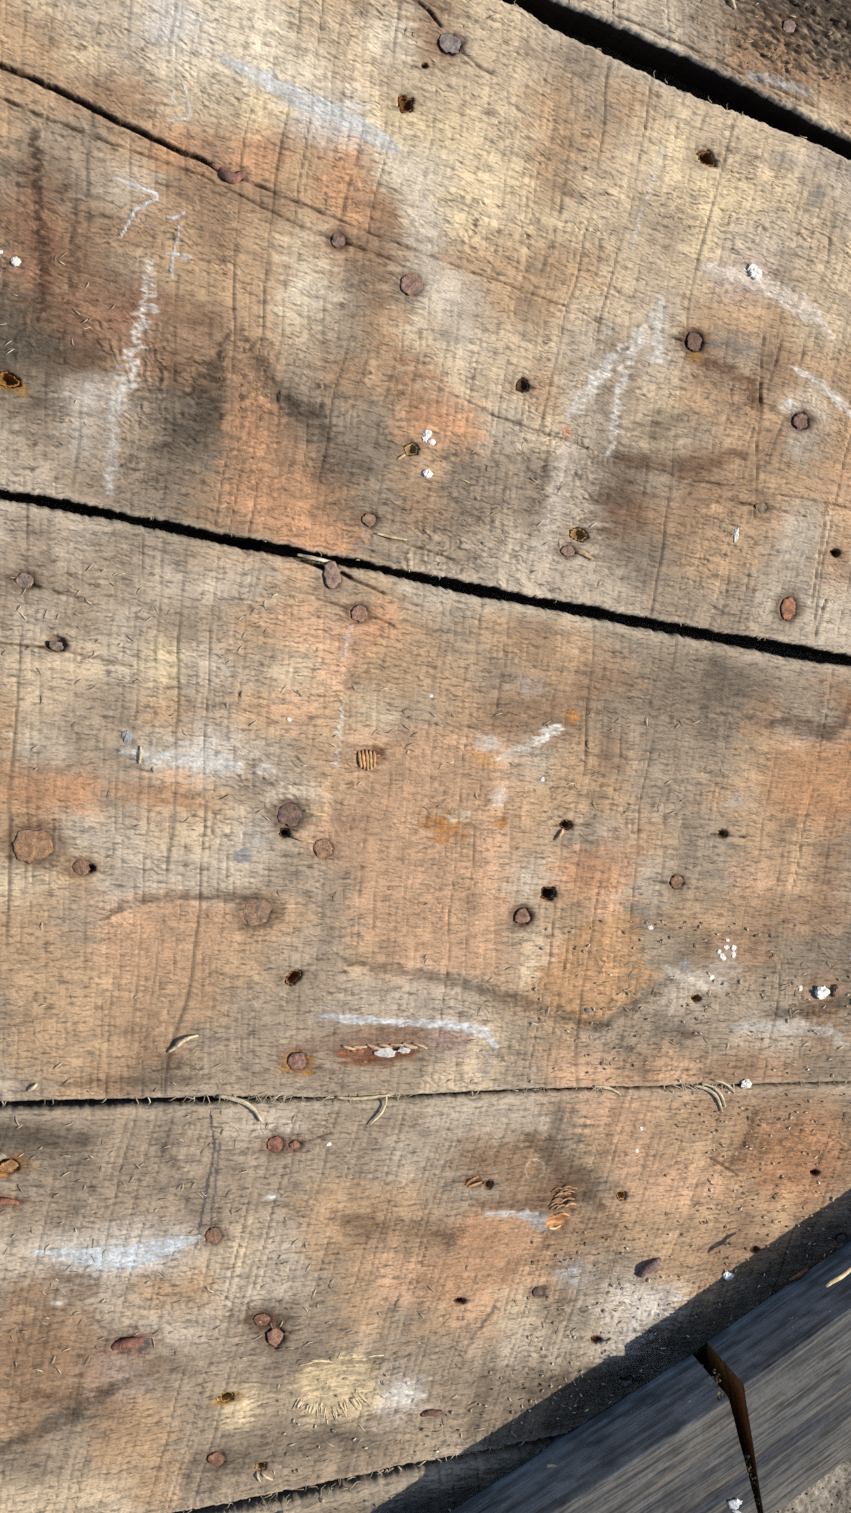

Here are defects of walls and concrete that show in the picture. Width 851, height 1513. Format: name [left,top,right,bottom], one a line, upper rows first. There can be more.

crack [0,65,214,170]